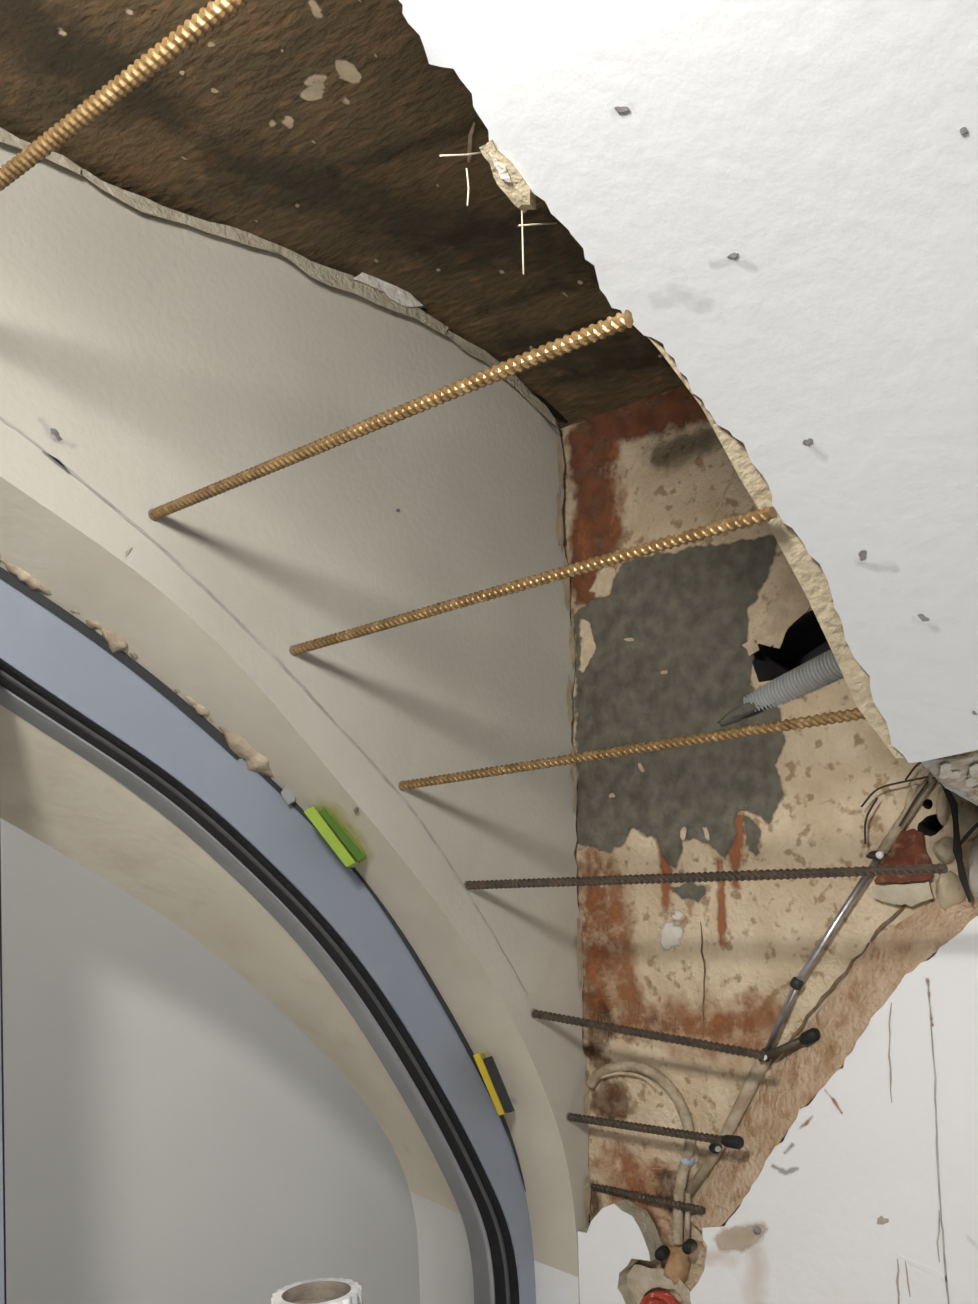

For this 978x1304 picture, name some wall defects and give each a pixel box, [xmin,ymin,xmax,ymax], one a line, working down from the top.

flaking render [0,0,905,815]
flaking render [925,754,978,804]
spalling [464,827,948,890]
corrosion [717,814,744,946]
corrosion [583,842,781,1056]
spalling [531,1009,765,1060]
crack [886,1002,894,1103]
spalling [566,1071,744,1149]
crack [926,978,949,1304]
corrosion [591,1149,673,1246]
spalling [583,1176,706,1224]
crack [896,1259,911,1304]